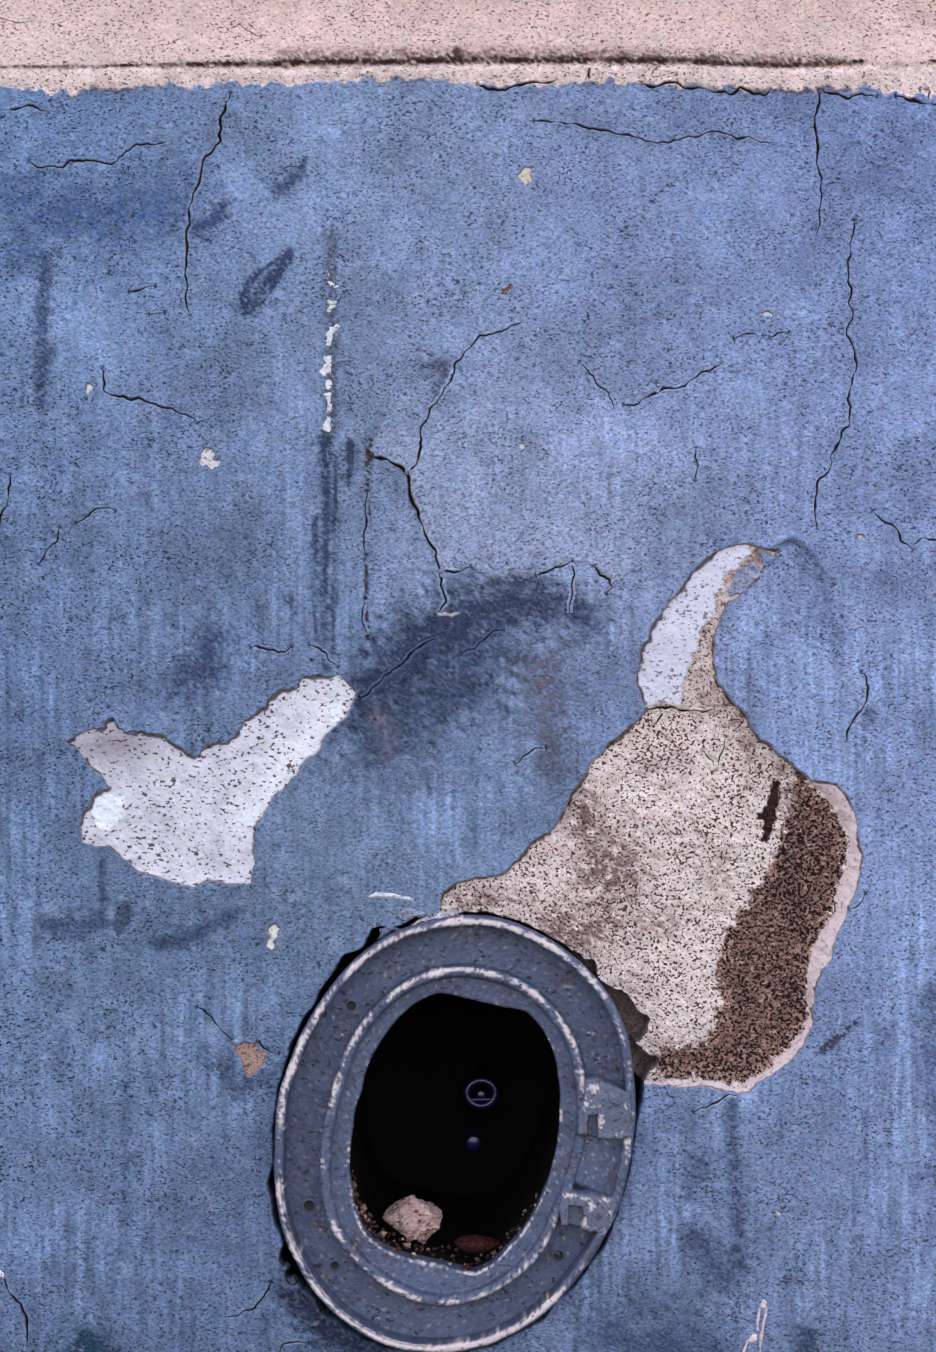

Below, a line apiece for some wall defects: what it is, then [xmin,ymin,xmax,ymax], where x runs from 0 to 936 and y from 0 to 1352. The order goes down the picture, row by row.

crack [28,93,234,318]
damp [239,249,294,315]
damp [429,362,451,397]
crack [477,77,773,147]
crack [578,329,788,411]
crack [811,86,936,529]
damp [312,435,354,649]
crack [360,320,523,700]
damp [350,575,596,765]
peeling [67,675,356,892]
spalling [369,545,862,1095]
peeling [236,1041,267,1076]